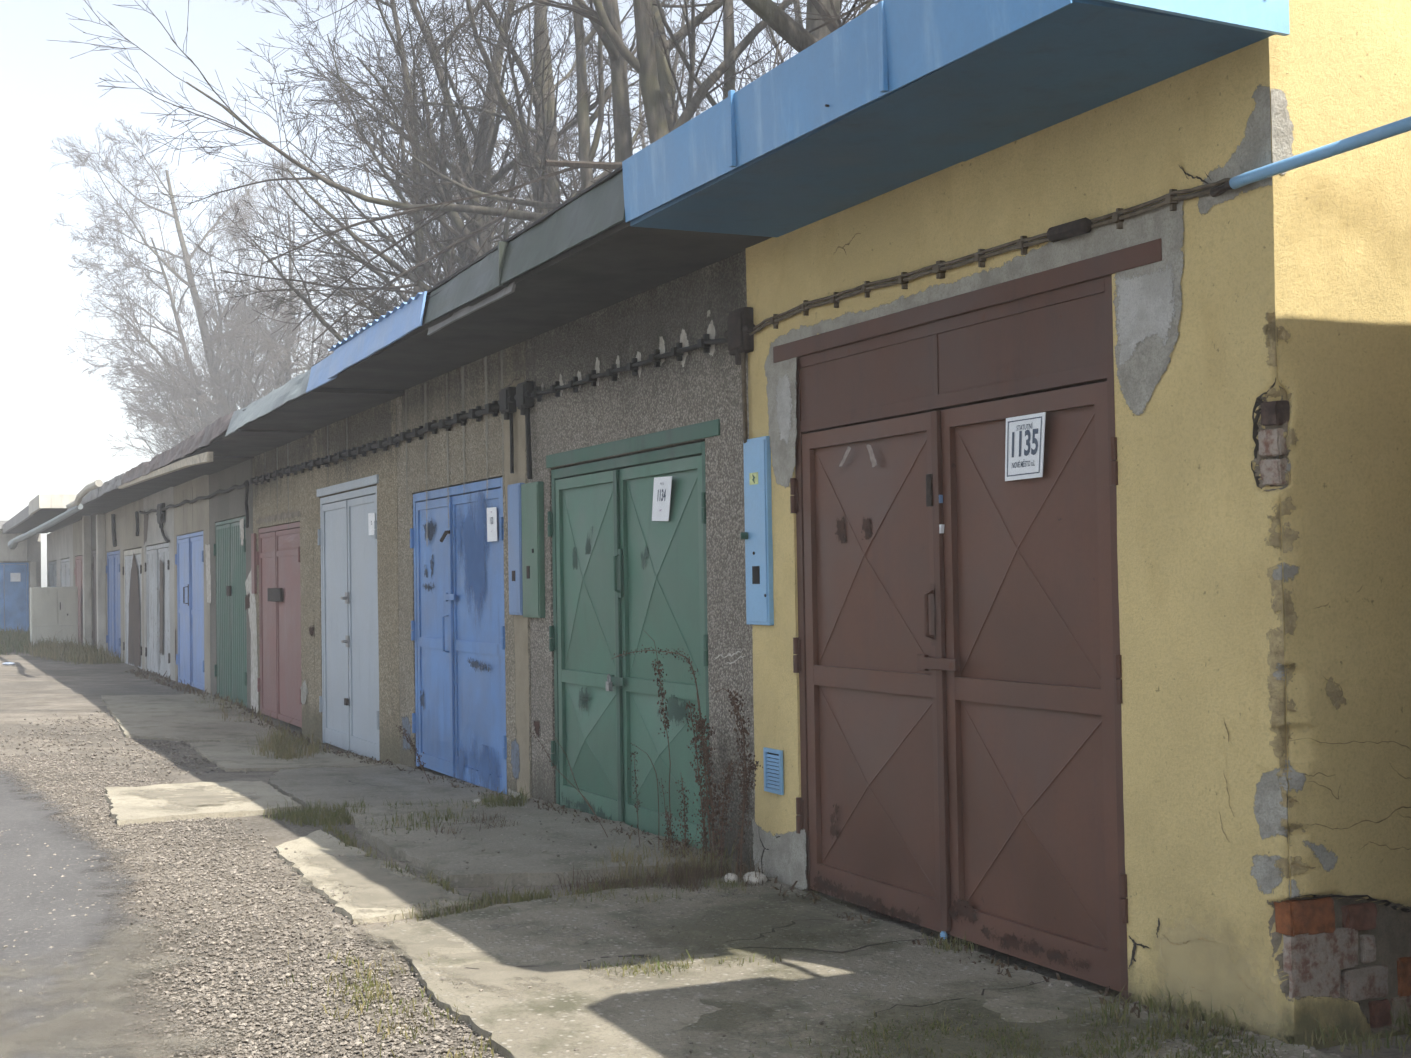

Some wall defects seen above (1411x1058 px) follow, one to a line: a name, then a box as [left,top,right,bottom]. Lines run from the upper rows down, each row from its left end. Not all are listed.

spalling [1198,84,1294,215]
spalling [1250,312,1411,1034]
crack [1288,738,1411,850]